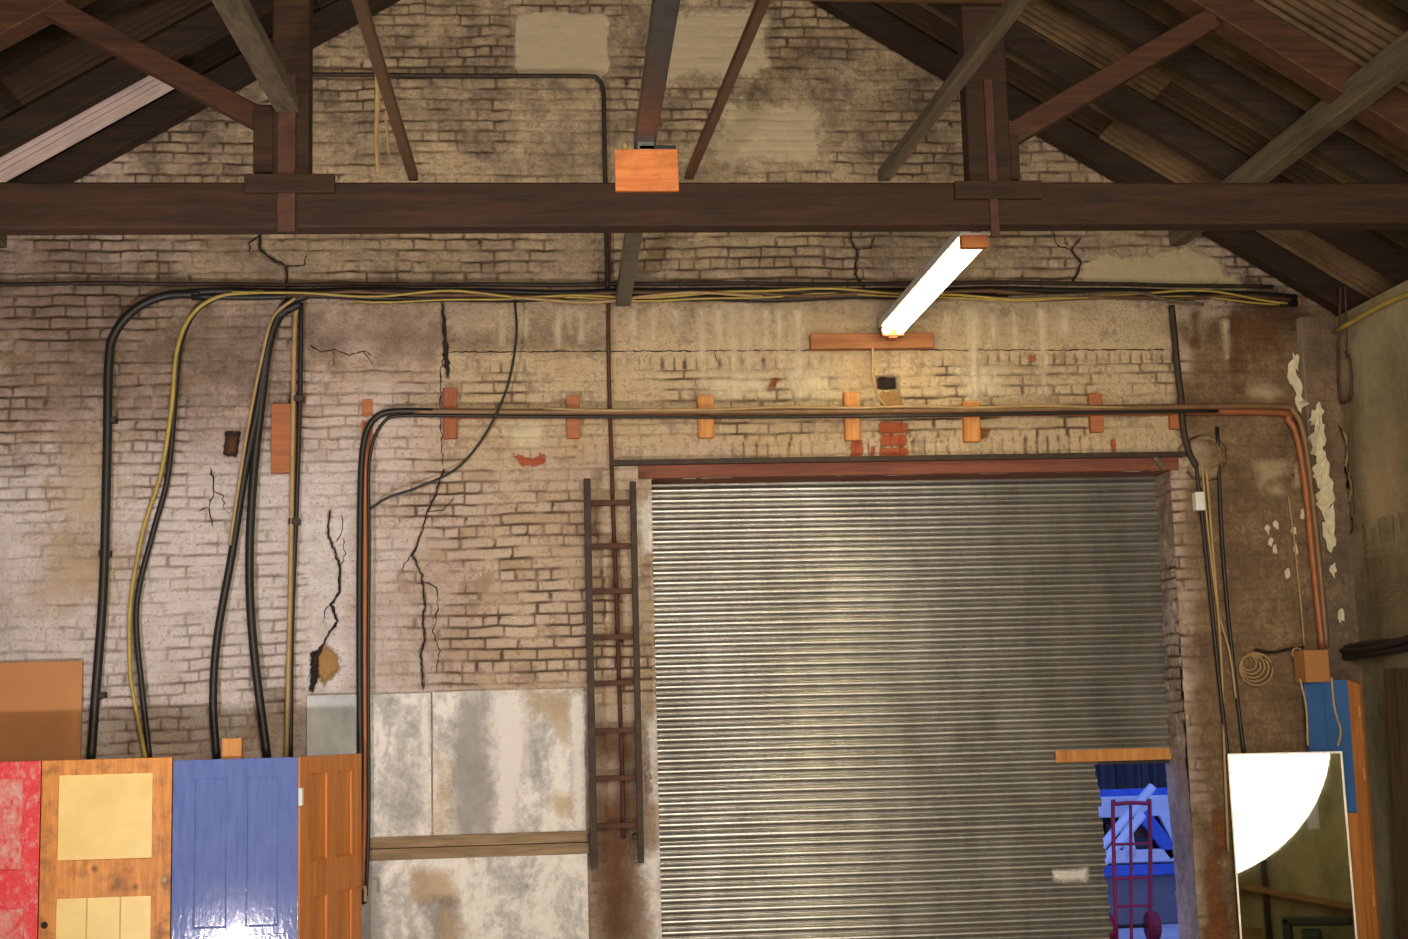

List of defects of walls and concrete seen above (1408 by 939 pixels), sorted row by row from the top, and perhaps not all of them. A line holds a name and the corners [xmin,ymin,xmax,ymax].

crack [886,346,1166,354]
spalling [514,453,545,467]
crack [402,303,809,687]
peeling [1253,353,1353,579]
spalling [309,644,340,692]
crack [307,511,347,692]